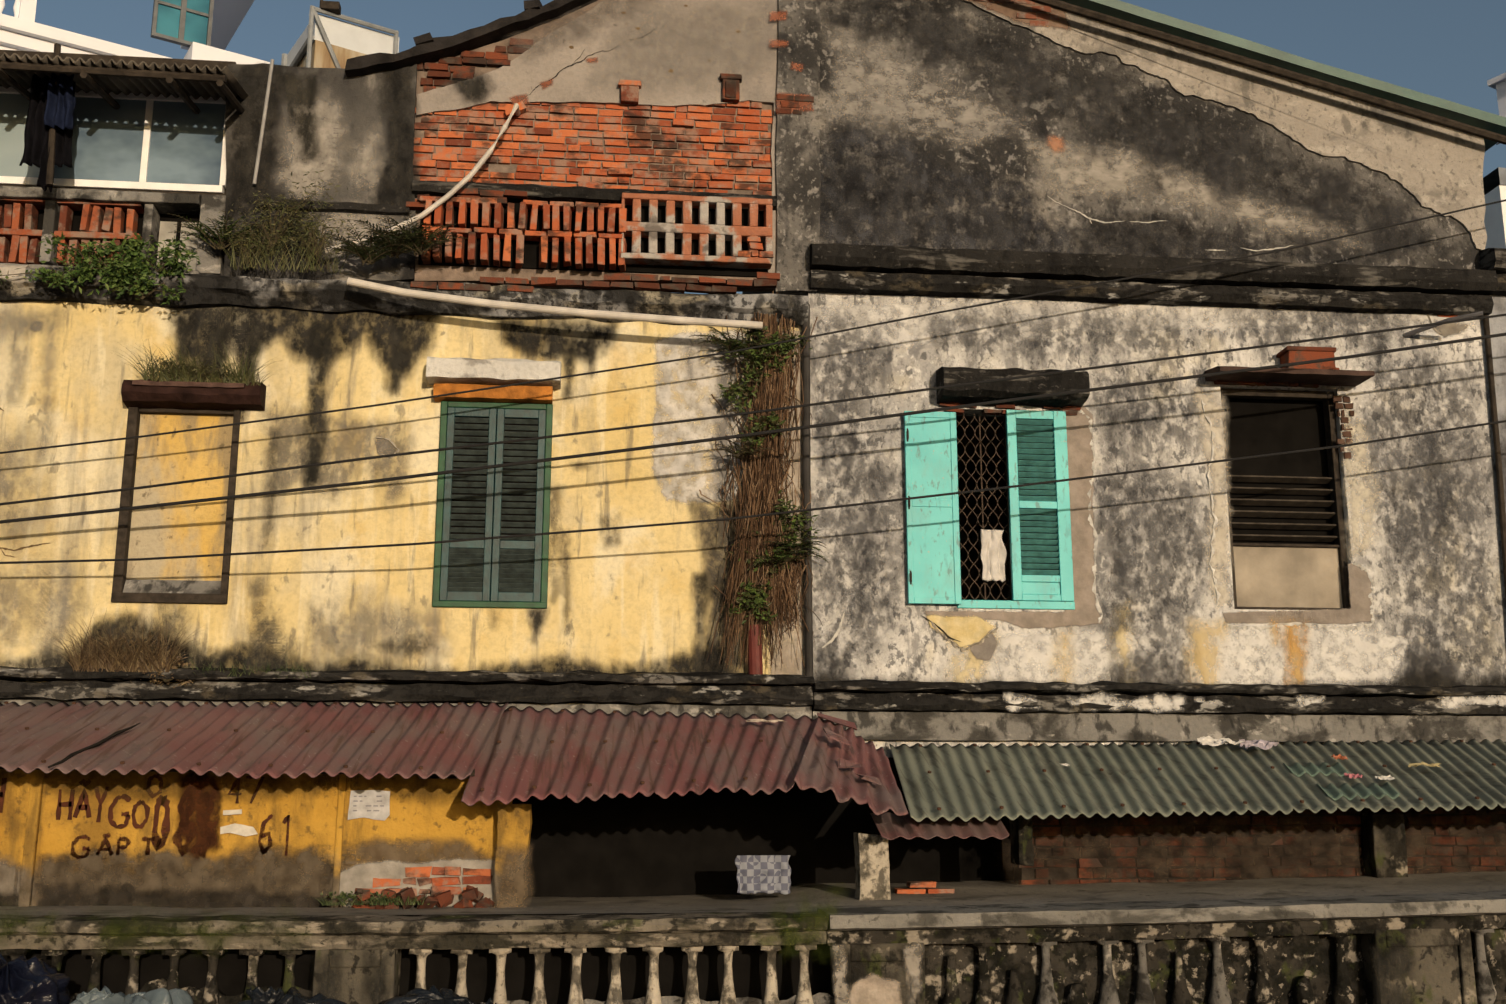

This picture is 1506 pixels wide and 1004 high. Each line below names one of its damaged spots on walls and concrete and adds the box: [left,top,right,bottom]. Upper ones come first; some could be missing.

water stain [820,0,1454,260]
water stain [174,306,436,494]
spalling [921,406,1212,711]
peeling [1195,387,1407,707]
spalling [339,859,497,909]